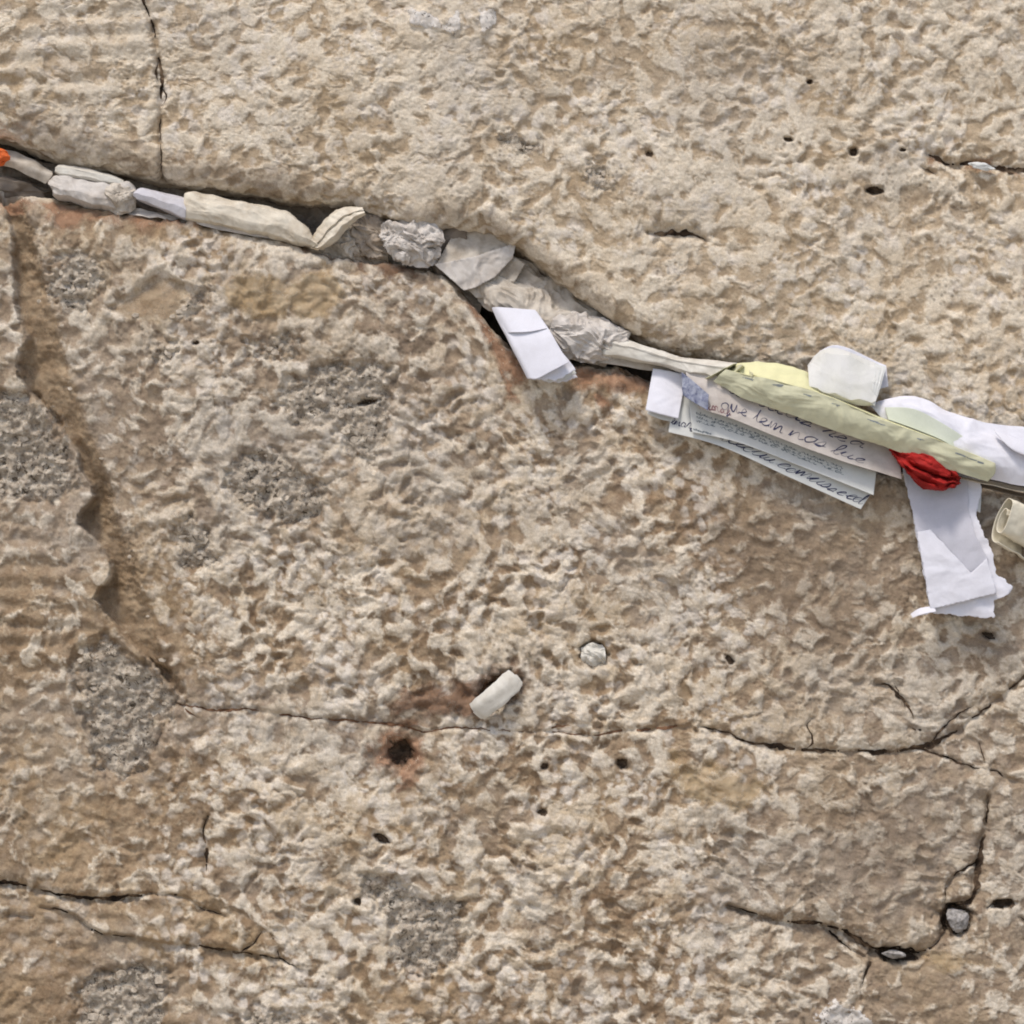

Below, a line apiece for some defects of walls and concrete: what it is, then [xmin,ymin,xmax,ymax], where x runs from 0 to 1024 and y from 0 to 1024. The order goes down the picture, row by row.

crack [142,0,167,174]
crack [923,154,1024,175]
crack [173,703,677,736]
crack [201,816,209,870]
crack [705,675,1024,984]
crack [0,880,177,913]
crack [184,932,294,966]